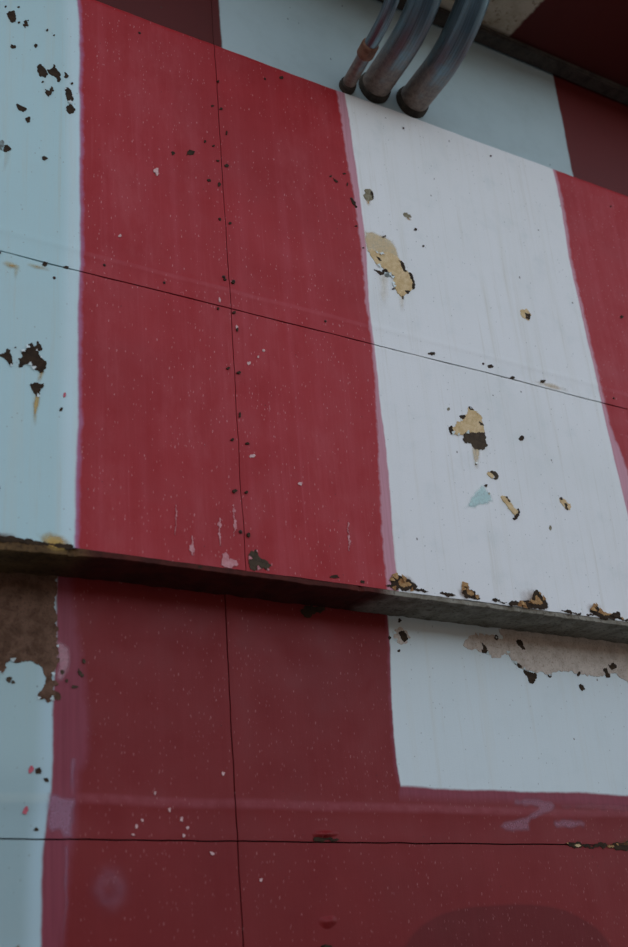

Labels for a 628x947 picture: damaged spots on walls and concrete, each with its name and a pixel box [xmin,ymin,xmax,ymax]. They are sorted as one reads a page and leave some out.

peeling [5,6,29,28]
peeling [37,64,76,114]
peeling [362,233,415,299]
rust [0,341,47,414]
peeling [447,406,488,465]
peeling [470,470,520,520]
rust [0,535,73,551]
peeling [221,549,271,571]
peeling [389,573,414,591]
rust [0,572,86,703]
peeling [463,628,628,691]